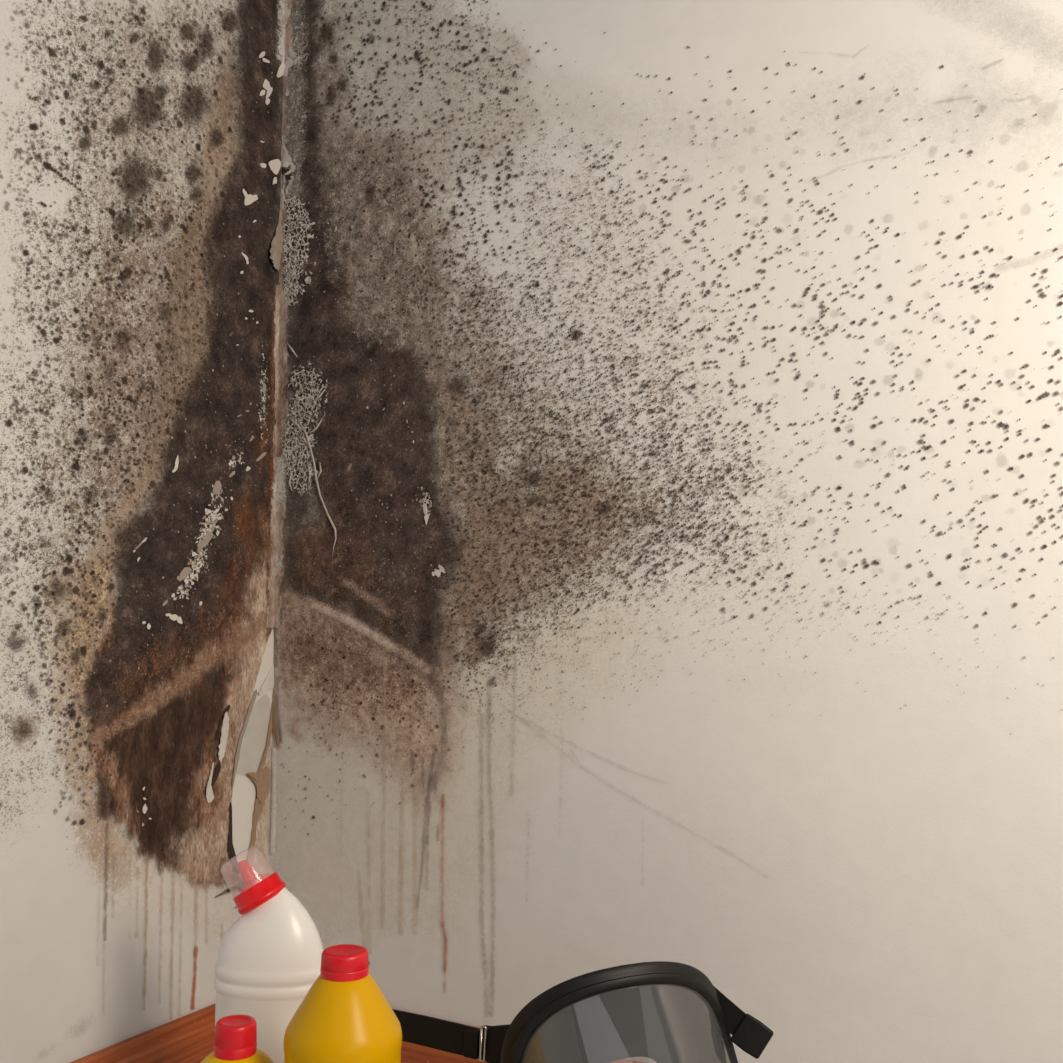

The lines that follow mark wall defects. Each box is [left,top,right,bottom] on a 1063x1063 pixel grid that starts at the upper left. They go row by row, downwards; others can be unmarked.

leakage [906,295,996,355]
leakage [936,225,1013,300]
leakage [1027,248,1063,307]
peeling [162,0,301,874]
leakage [0,0,945,919]
leakage [913,349,1063,444]
leakage [922,410,1063,588]